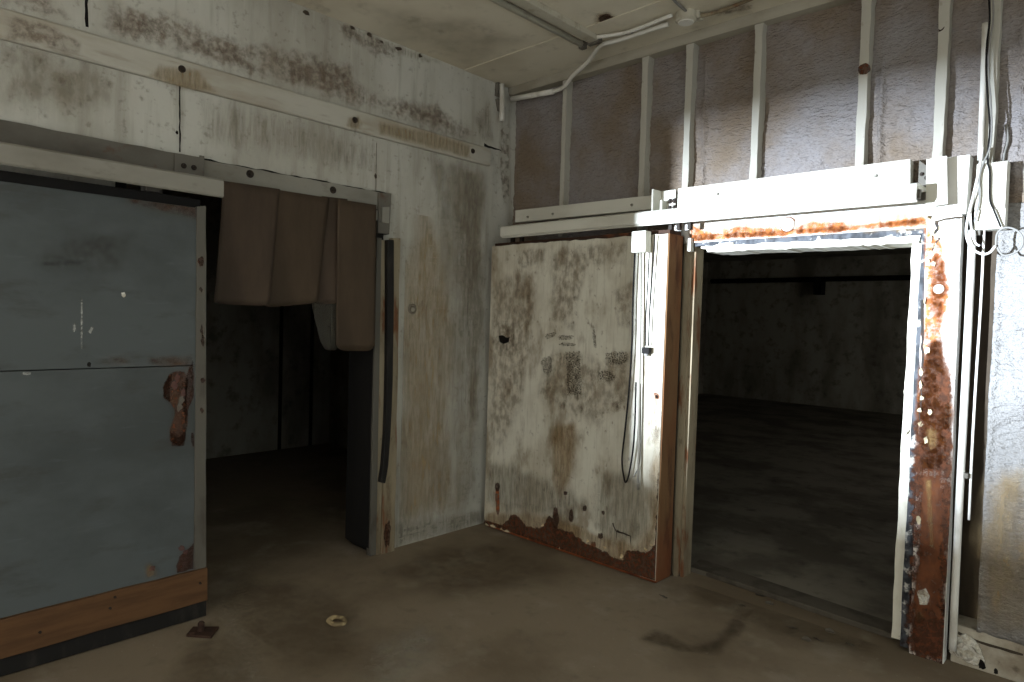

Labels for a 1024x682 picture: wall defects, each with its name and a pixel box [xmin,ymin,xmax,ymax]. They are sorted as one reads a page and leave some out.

crack [83,0,91,27]
crack [176,86,184,152]
rust [163,371,204,446]
rust [690,213,954,664]
rust [484,473,659,581]